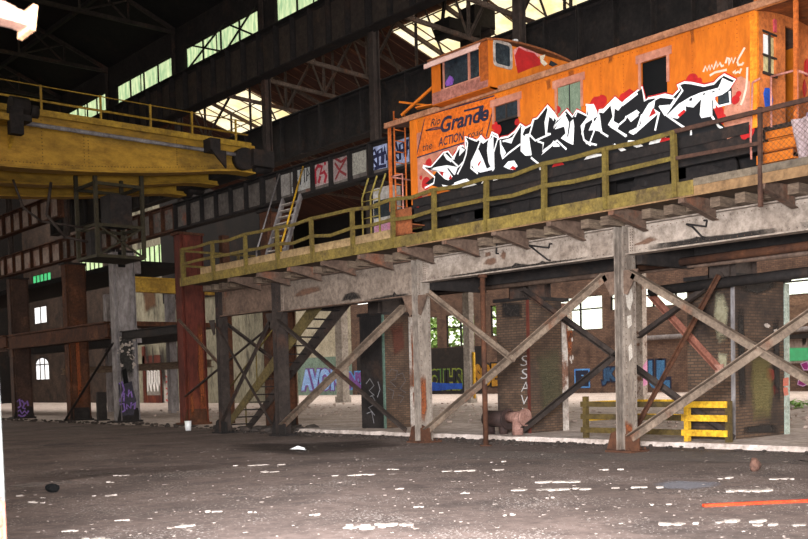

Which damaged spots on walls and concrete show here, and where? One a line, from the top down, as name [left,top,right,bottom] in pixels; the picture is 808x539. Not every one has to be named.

damp [656,229,773,249]